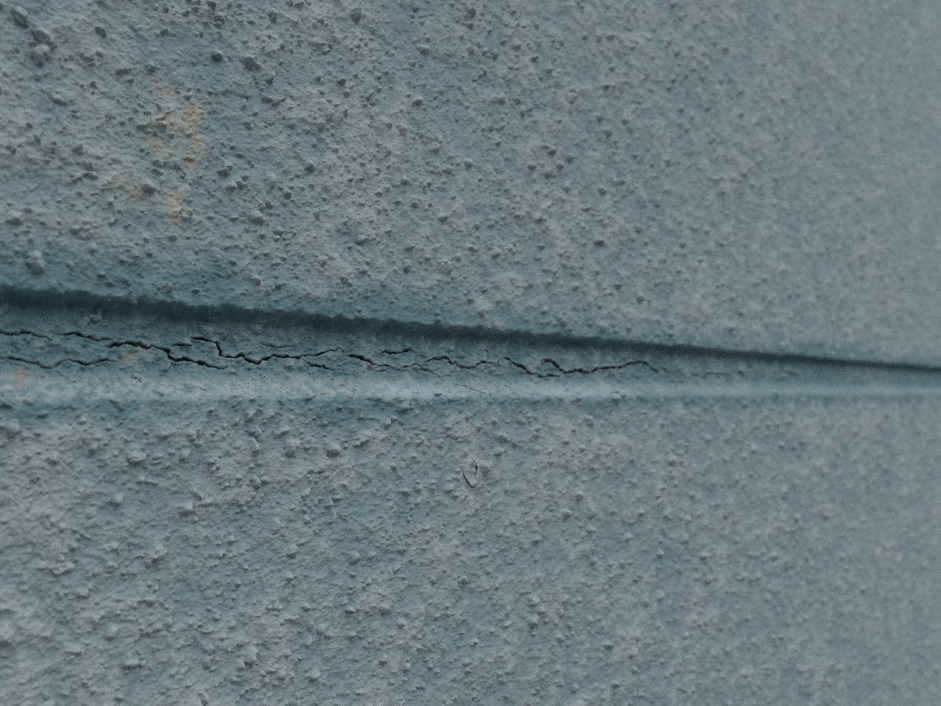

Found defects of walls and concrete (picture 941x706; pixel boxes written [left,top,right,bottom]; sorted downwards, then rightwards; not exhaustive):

crack [0,331,744,396]